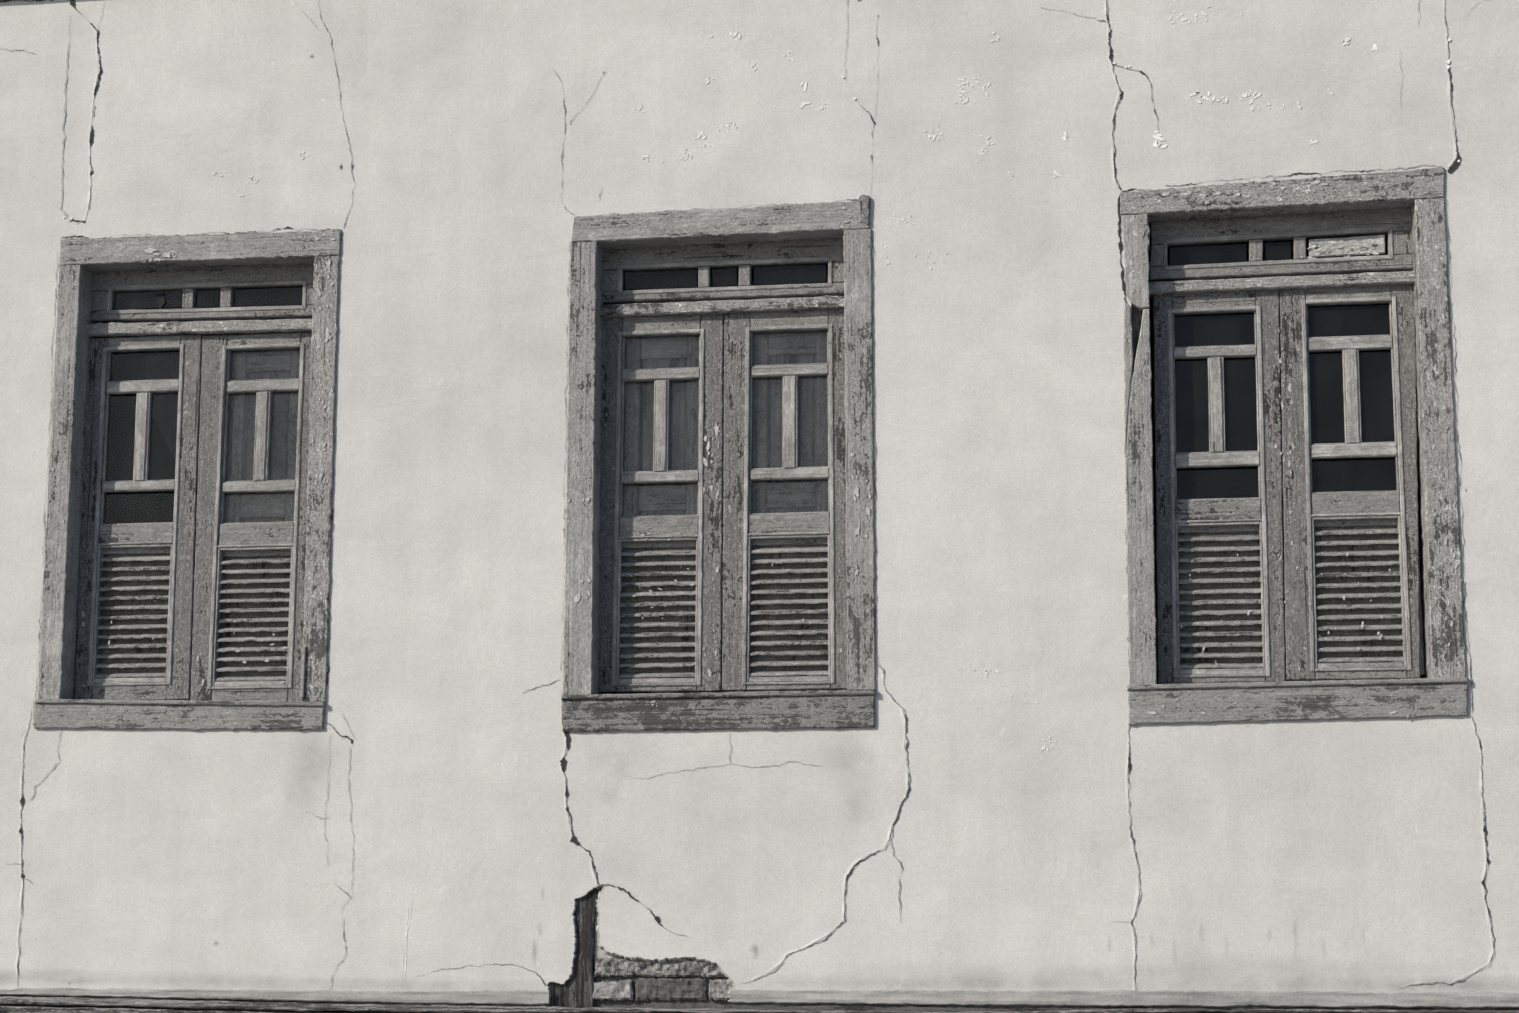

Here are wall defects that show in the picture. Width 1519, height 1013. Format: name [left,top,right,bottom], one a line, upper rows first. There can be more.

crack [0,0,104,225]
crack [296,0,355,228]
crack [842,0,879,195]
crack [1041,0,1158,190]
crack [1399,0,1484,173]
crack [9,710,62,988]
crack [308,714,355,991]
crack [559,732,686,936]
flaking render [547,885,735,1013]
crack [740,665,911,984]
crack [1115,724,1142,990]
crack [1398,716,1495,989]